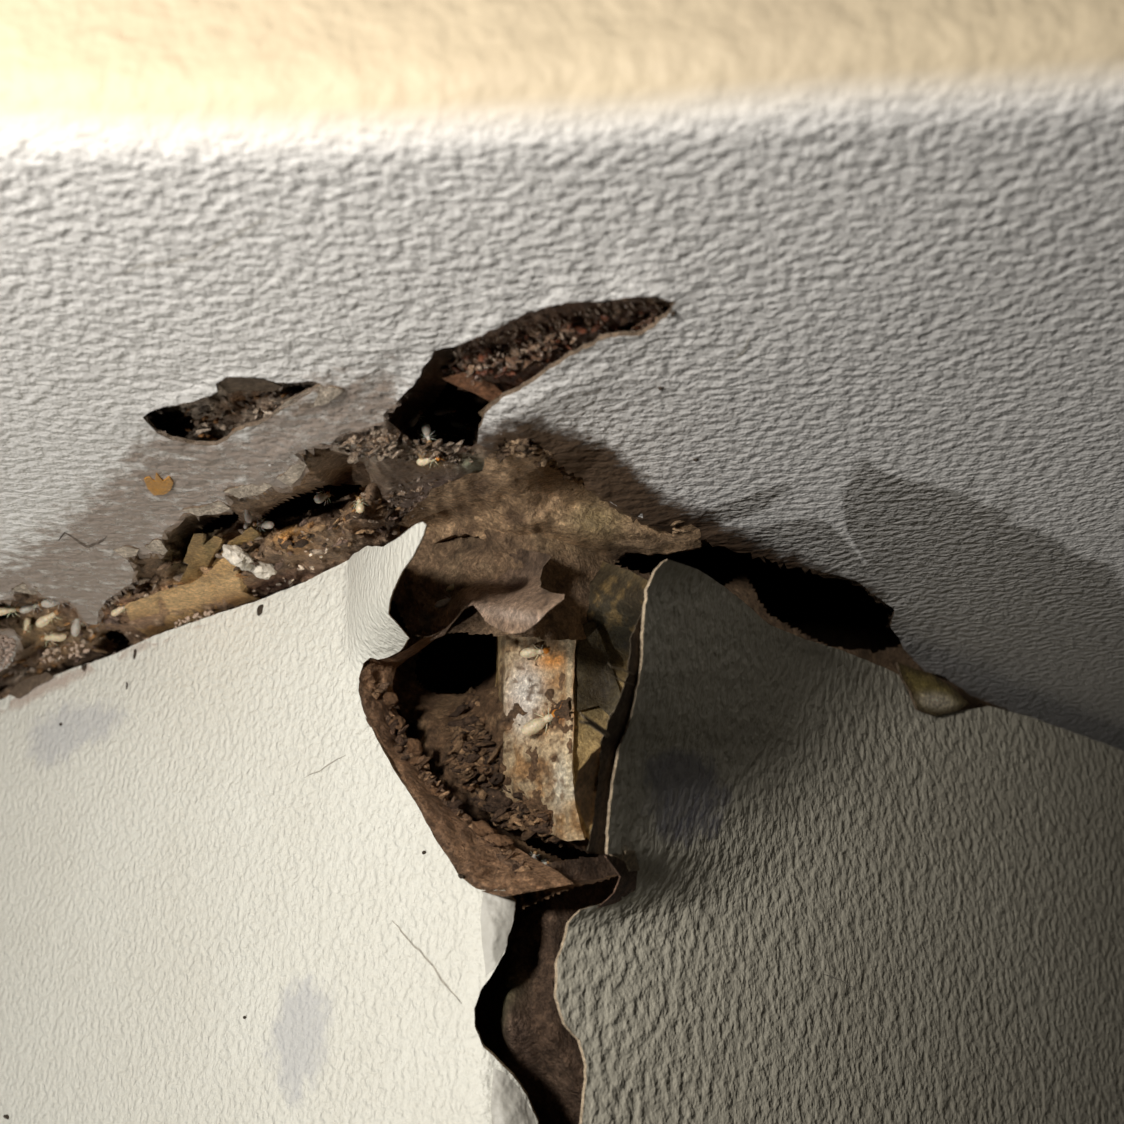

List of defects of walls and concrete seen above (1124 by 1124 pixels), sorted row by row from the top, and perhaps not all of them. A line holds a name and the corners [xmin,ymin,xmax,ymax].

spalling [145,377,345,442]
spalling [384,296,672,461]
peeling [144,473,173,495]
peeling [0,634,17,671]
spalling [359,529,651,912]
spalling [724,573,1008,715]
crack [392,854,619,1124]